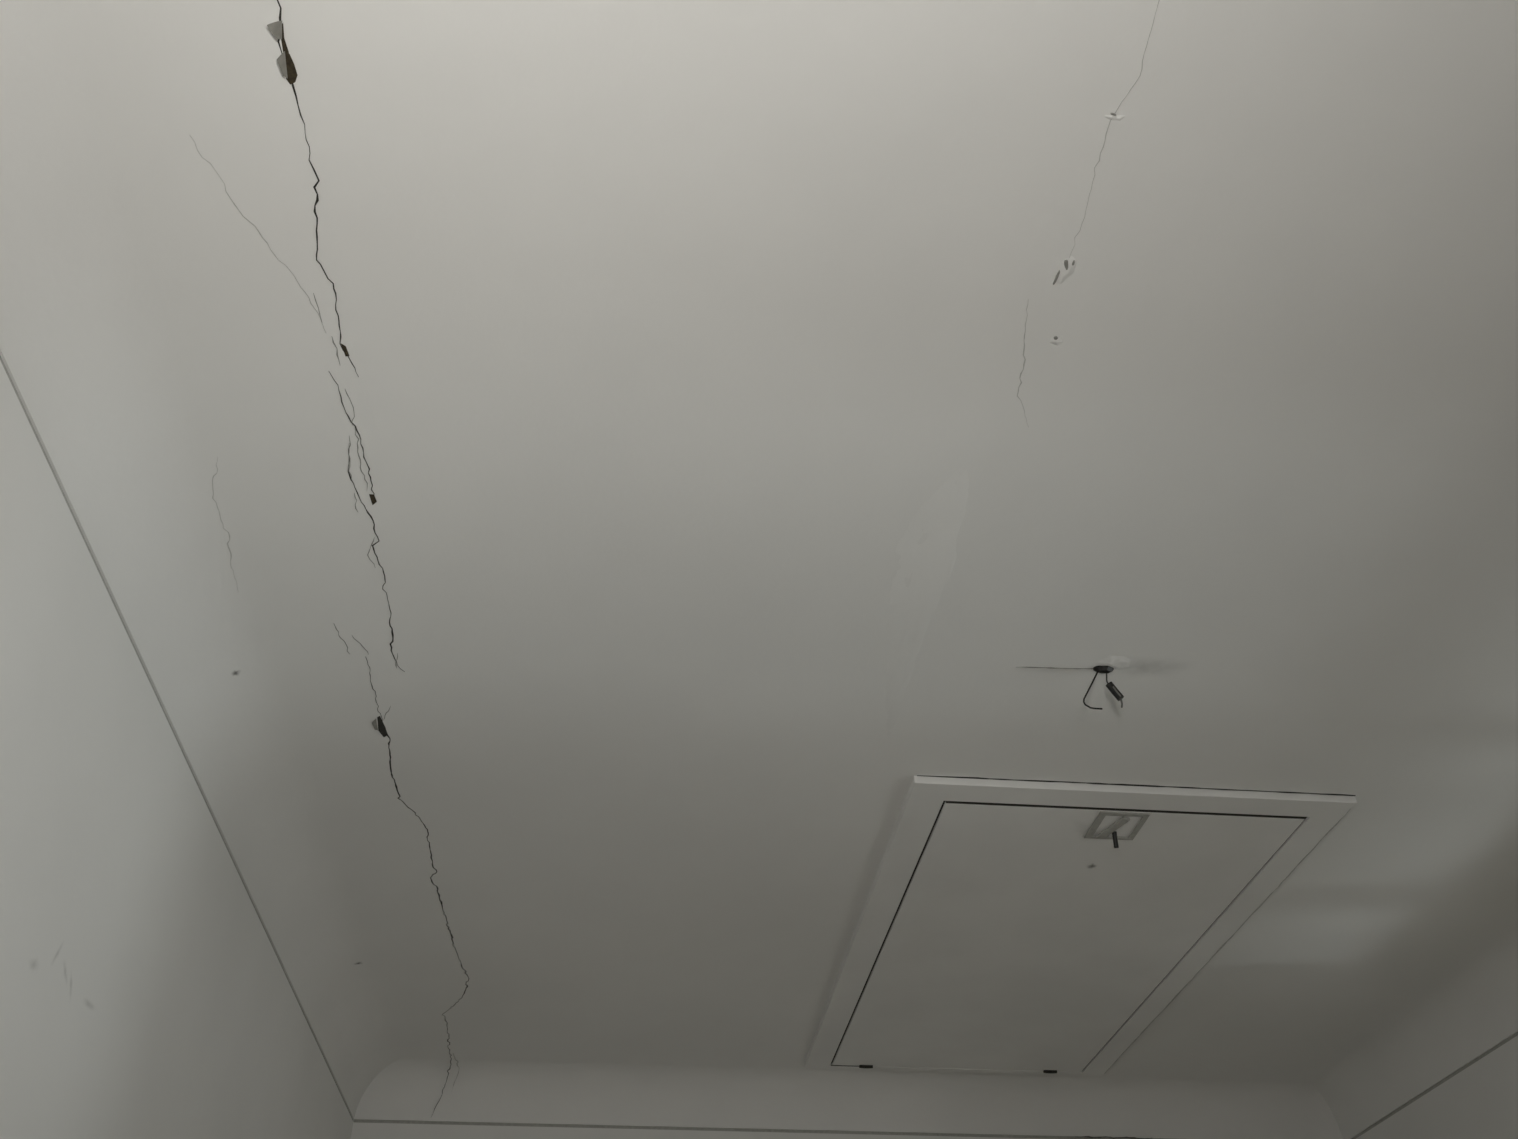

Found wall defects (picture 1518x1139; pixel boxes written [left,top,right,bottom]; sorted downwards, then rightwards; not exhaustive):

crack [1069,0,1160,258]
crack [1017,305,1029,427]
crack [190,0,469,1117]